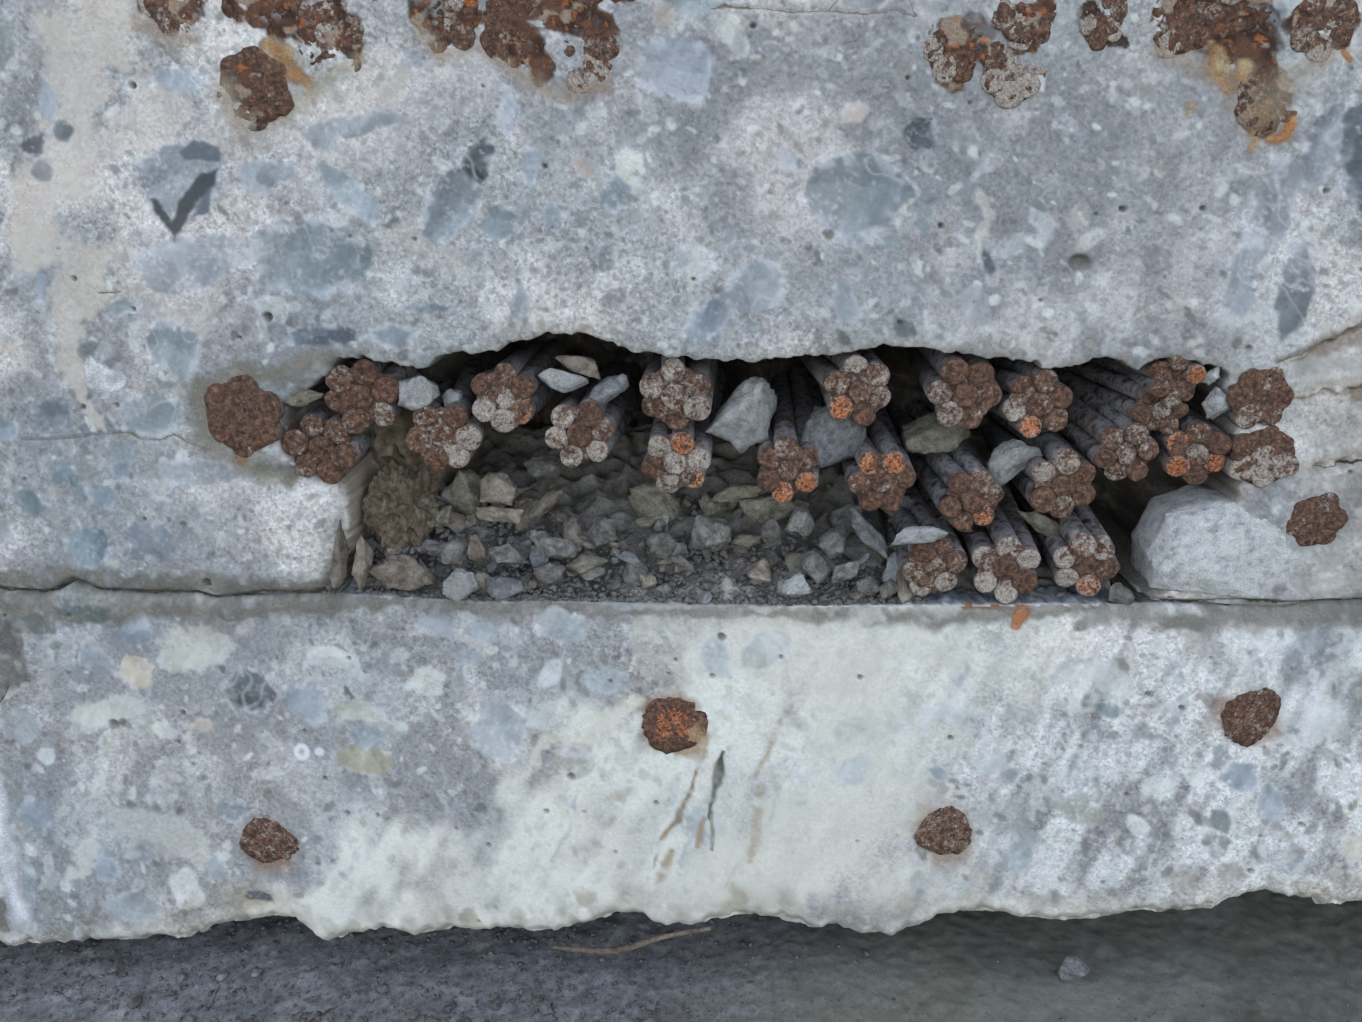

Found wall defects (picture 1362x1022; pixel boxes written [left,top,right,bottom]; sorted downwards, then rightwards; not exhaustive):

rust [227,0,364,88]
rust [499,0,625,94]
rust [1014,0,1054,55]
rust [1079,0,1129,48]
rust [1163,0,1317,152]
spalling [417,332,655,429]
spalling [718,356,826,407]
spalling [870,344,934,413]
spalling [1185,360,1238,435]
crack [1276,325,1362,364]
crack [1316,459,1362,468]
spalling [1057,431,1240,597]